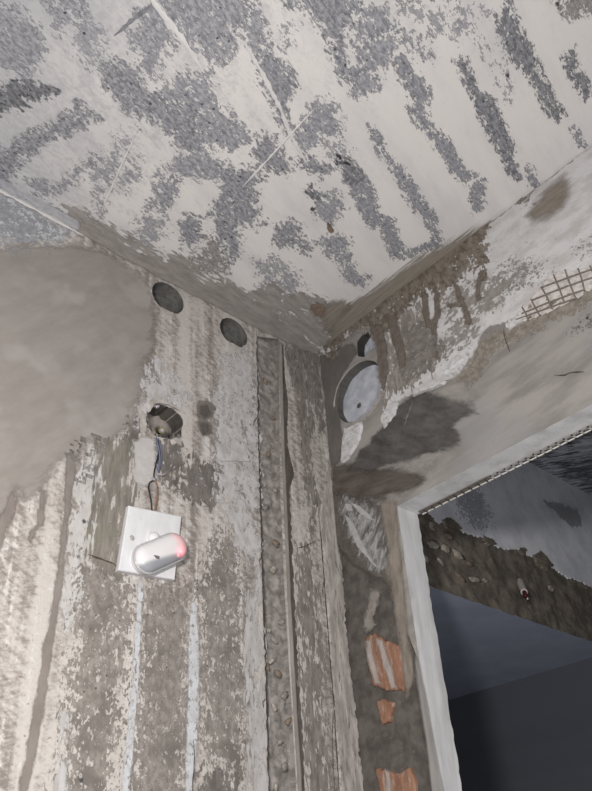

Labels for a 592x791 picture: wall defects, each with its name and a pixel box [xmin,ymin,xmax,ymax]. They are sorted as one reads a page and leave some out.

crack [114,1,157,36]
flaking render [0,0,592,428]
damp [516,180,568,219]
damp [320,221,515,586]
flaking render [320,409,363,791]
flaking render [366,633,407,725]
flaking render [375,767,418,791]